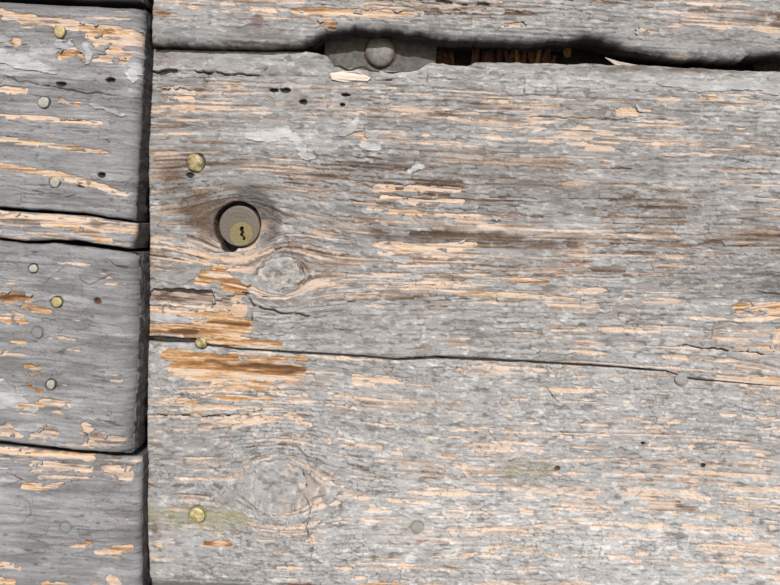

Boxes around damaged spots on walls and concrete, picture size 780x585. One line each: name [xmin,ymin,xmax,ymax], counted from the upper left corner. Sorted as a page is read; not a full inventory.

peeling [0,8,145,83]
peeling [0,86,28,95]
peeling [0,114,103,126]
peeling [0,136,111,156]
peeling [0,162,129,197]
peeling [0,290,52,325]
peeling [732,301,780,317]
peeling [149,306,308,404]
crack [150,291,775,385]
peeling [0,364,71,413]
peeling [0,422,136,490]
peeling [70,541,137,557]